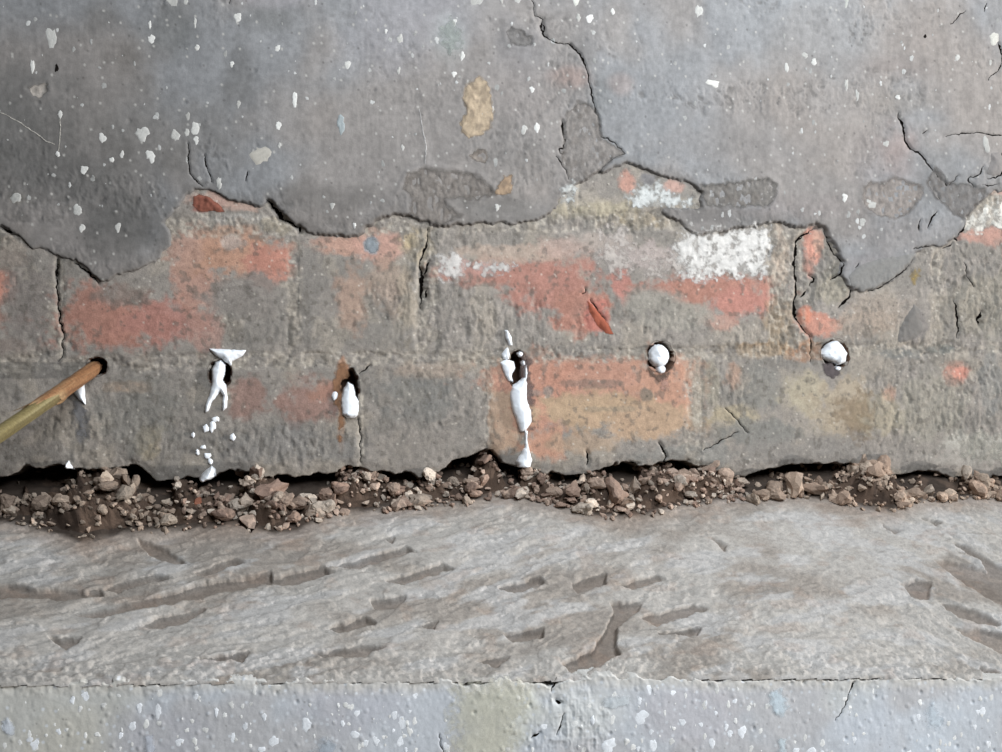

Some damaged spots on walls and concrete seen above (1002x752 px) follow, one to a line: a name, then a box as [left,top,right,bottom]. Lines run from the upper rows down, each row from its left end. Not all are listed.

spalling [30,83,48,98]
spalling [460,77,494,138]
crack [532,1,625,179]
spalling [0,103,1002,481]
efflorescence [595,221,773,283]
crack [792,113,1002,361]